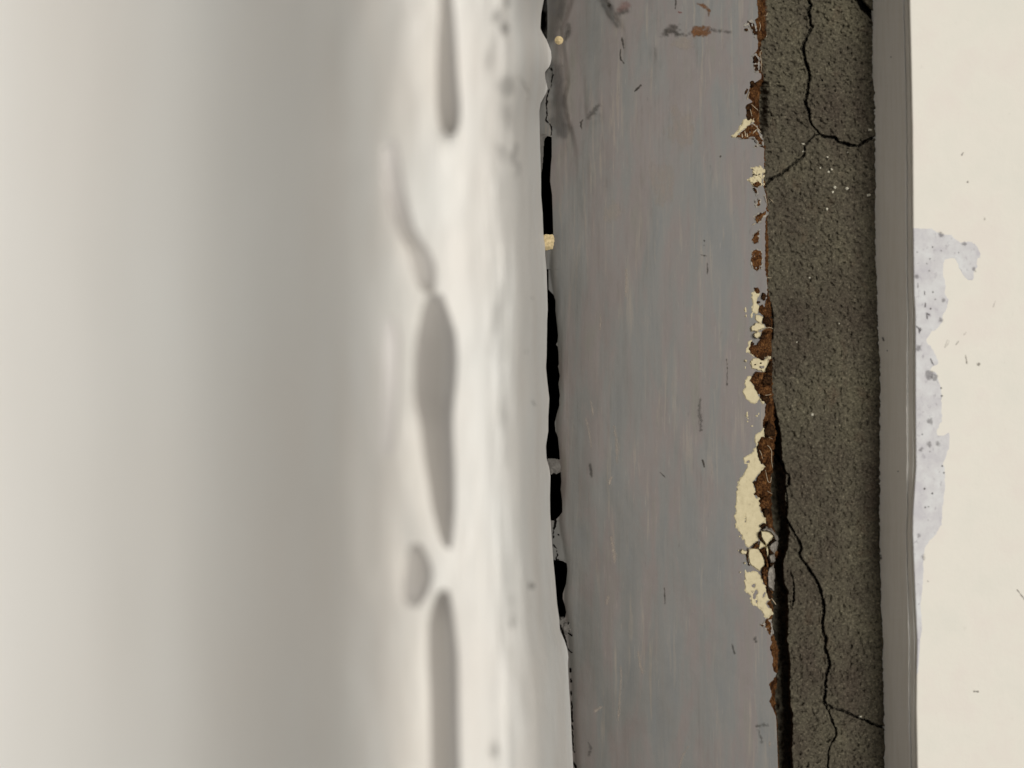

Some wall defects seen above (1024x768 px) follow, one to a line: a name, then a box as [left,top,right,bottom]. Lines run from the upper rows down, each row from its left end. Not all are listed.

crack [765,0,873,188]
peeling [731,0,779,768]
crack [773,451,882,768]